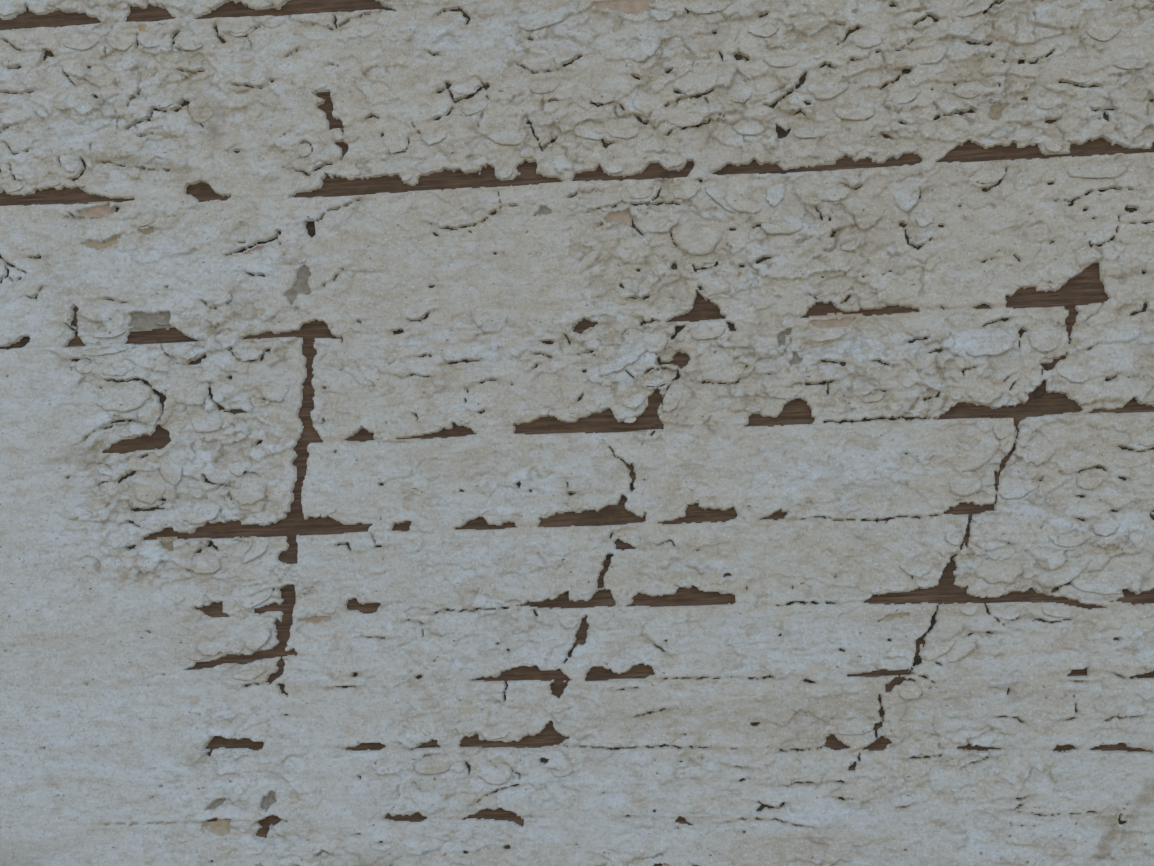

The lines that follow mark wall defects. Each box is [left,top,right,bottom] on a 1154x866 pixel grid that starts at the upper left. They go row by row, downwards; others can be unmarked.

peeling [936,133,1154,192]
peeling [65,299,382,574]
peeling [514,287,736,436]
peeling [520,573,747,628]
peeling [538,482,737,541]
crack [803,515,932,523]
crack [960,519,972,550]
peeling [847,510,1154,700]
peeling [962,263,1109,375]
crack [994,311,1078,491]
peeling [923,361,1154,519]
crack [848,608,938,770]